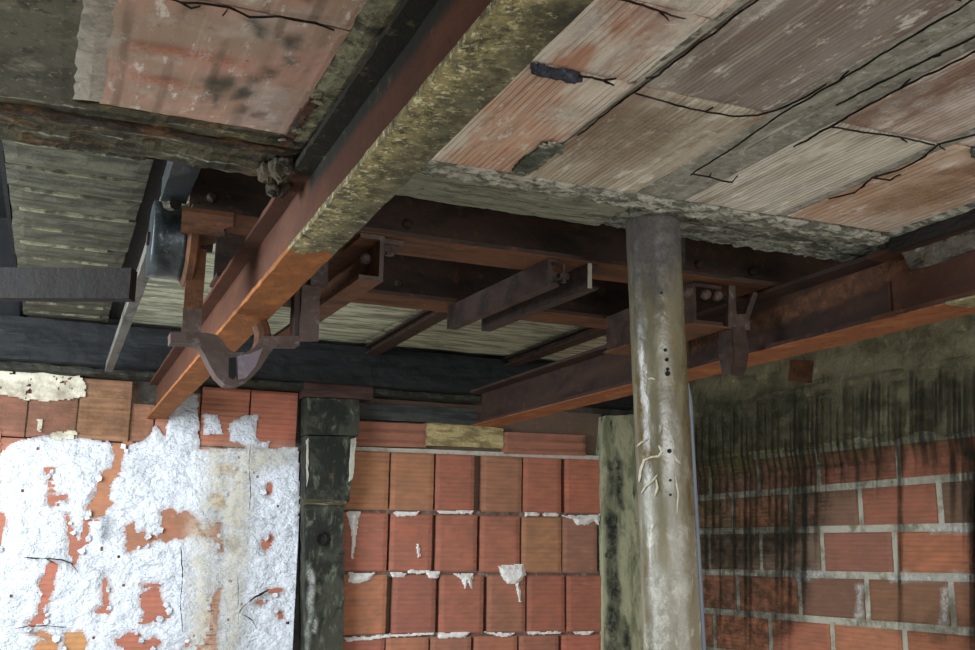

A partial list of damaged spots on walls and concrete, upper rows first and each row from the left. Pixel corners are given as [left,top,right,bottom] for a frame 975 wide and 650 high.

crack [172,0,334,31]
crack [577,0,975,200]
corrosion [750,257,907,329]
peeling [44,441,133,565]
peeling [122,509,224,552]
damp [606,457,631,650]
damp [695,369,975,650]
peeling [24,561,87,650]
peeling [95,578,112,614]
peeling [116,581,172,650]
peeling [184,588,221,650]
damp [305,569,317,649]